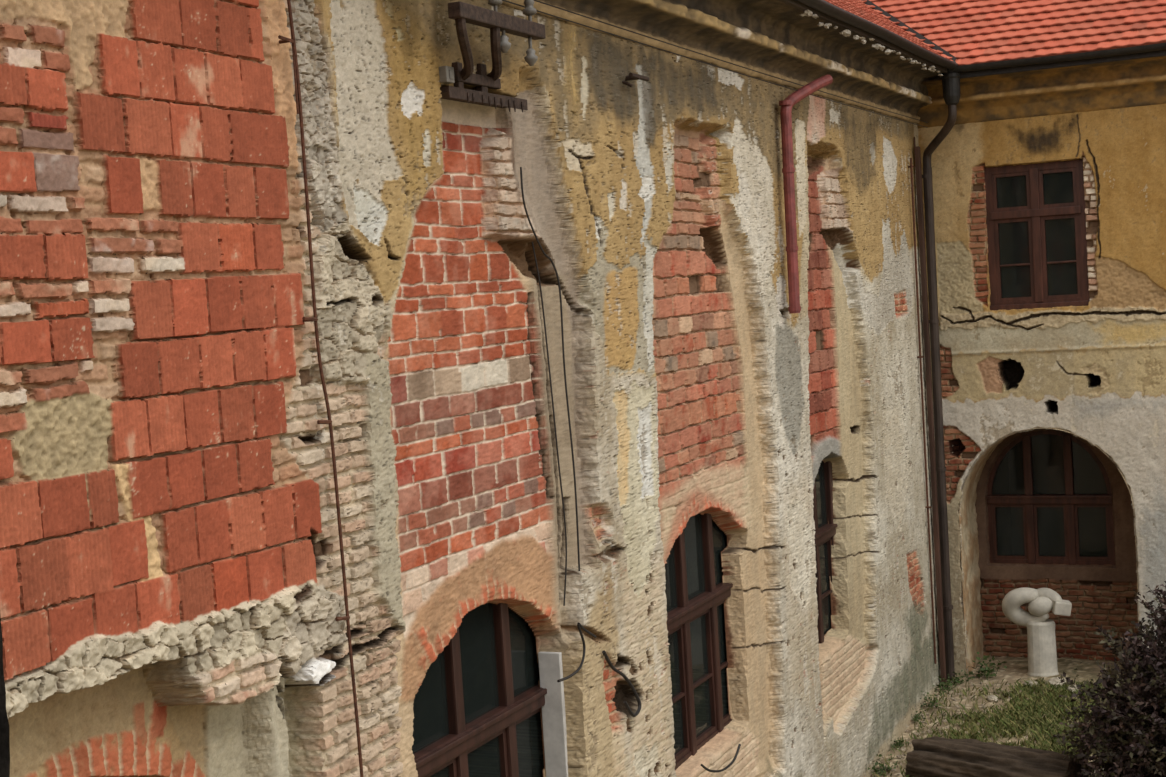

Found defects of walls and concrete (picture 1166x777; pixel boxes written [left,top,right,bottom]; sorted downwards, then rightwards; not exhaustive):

peeling [795,94,840,237]
hole [497,237,556,286]
peeling [819,218,915,335]
flaking render [936,151,1166,330]
crack [941,306,1166,330]
crack [850,425,861,434]
crack [833,474,879,482]
flaking render [943,425,981,503]
crack [833,512,877,520]
crack [722,544,786,554]
crack [743,585,787,593]
flaking render [560,624,760,777]